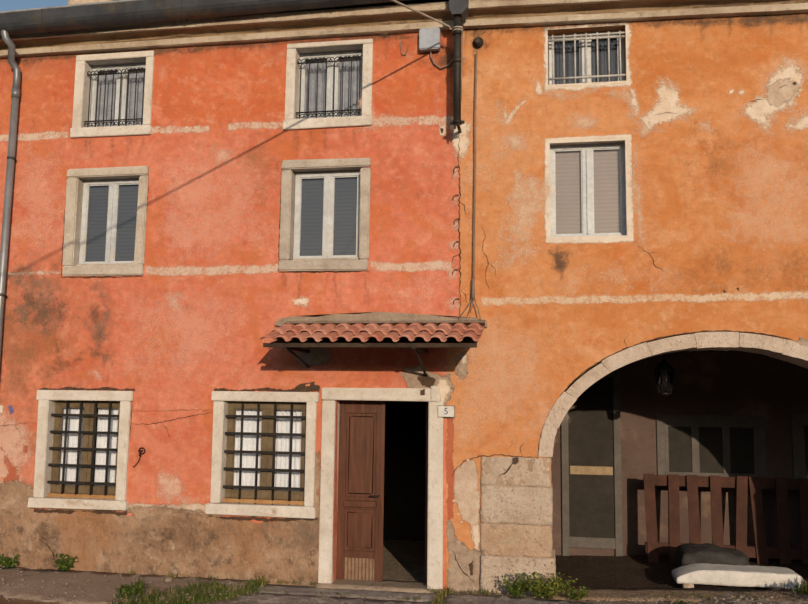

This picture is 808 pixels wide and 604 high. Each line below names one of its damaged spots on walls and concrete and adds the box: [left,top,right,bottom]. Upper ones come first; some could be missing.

peeling [610,80,694,136]
peeling [745,59,803,131]
peeling [785,115,808,130]
damp [553,252,567,269]
flaking render [401,353,469,405]
crack [130,409,212,436]
peeling [0,414,321,522]
flaking render [445,417,481,592]